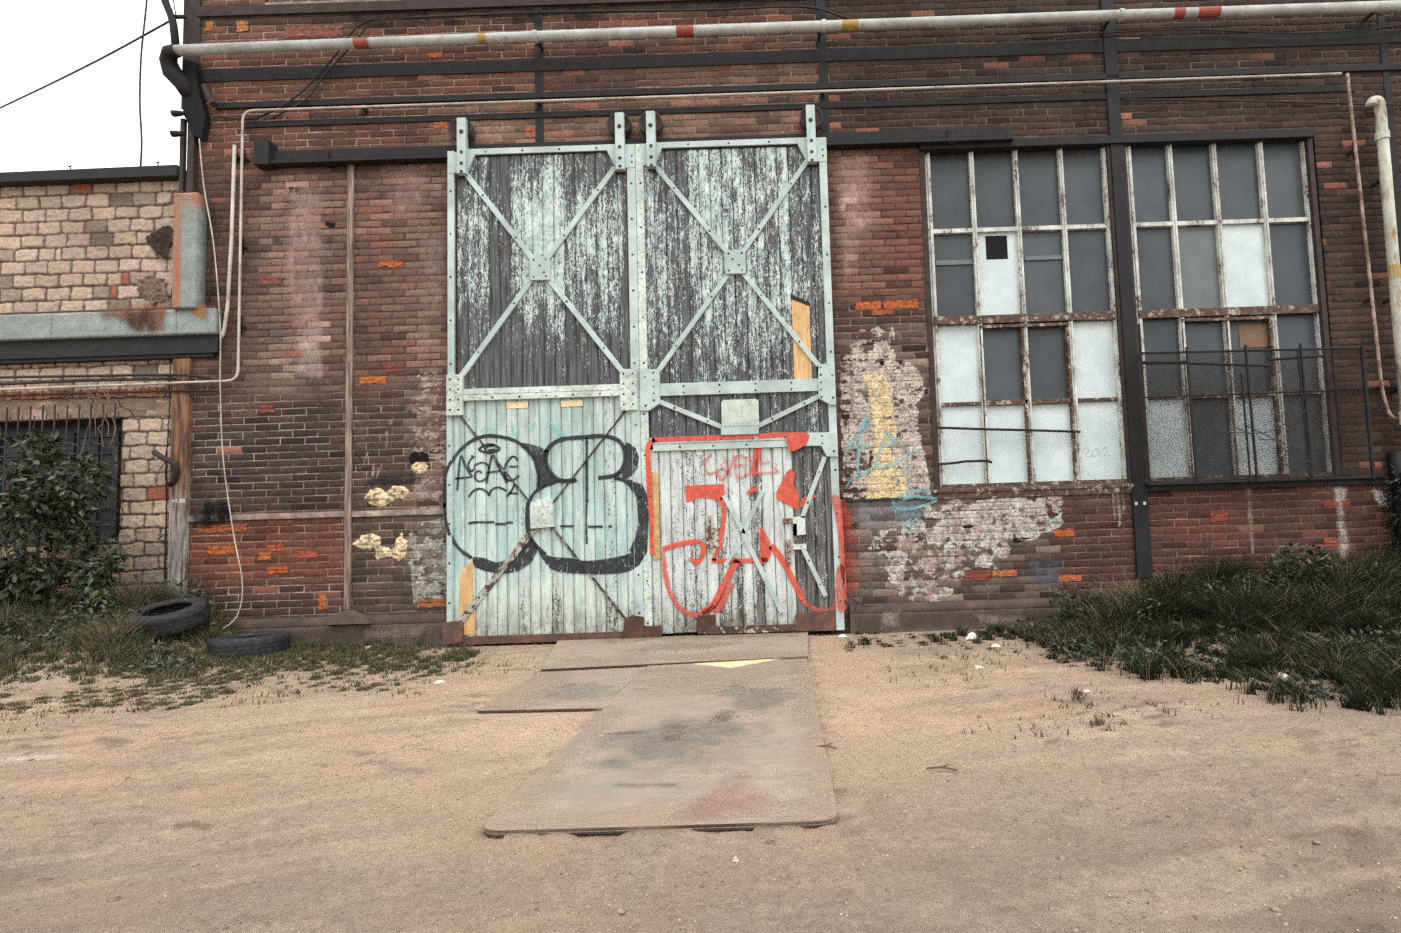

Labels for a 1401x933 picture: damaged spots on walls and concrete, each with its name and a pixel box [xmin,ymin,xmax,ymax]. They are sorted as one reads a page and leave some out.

corrosion [104,305,164,329]
peeling [840,299,1075,602]
spalling [1057,574,1082,582]